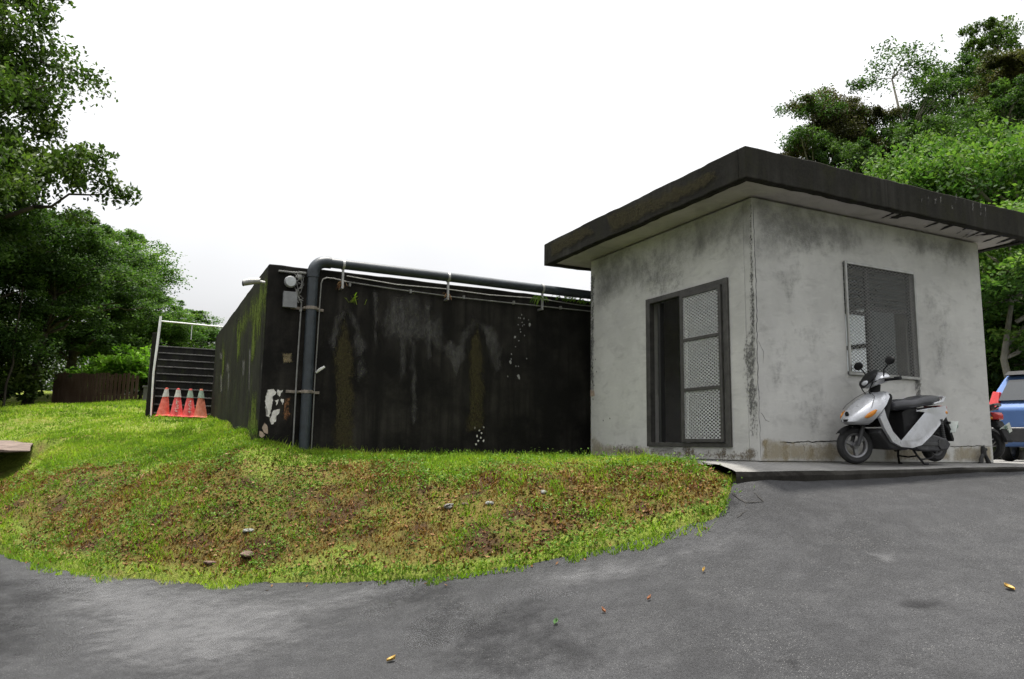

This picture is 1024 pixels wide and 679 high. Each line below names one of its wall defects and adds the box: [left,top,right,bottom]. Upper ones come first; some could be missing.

peeling [259,389,284,437]